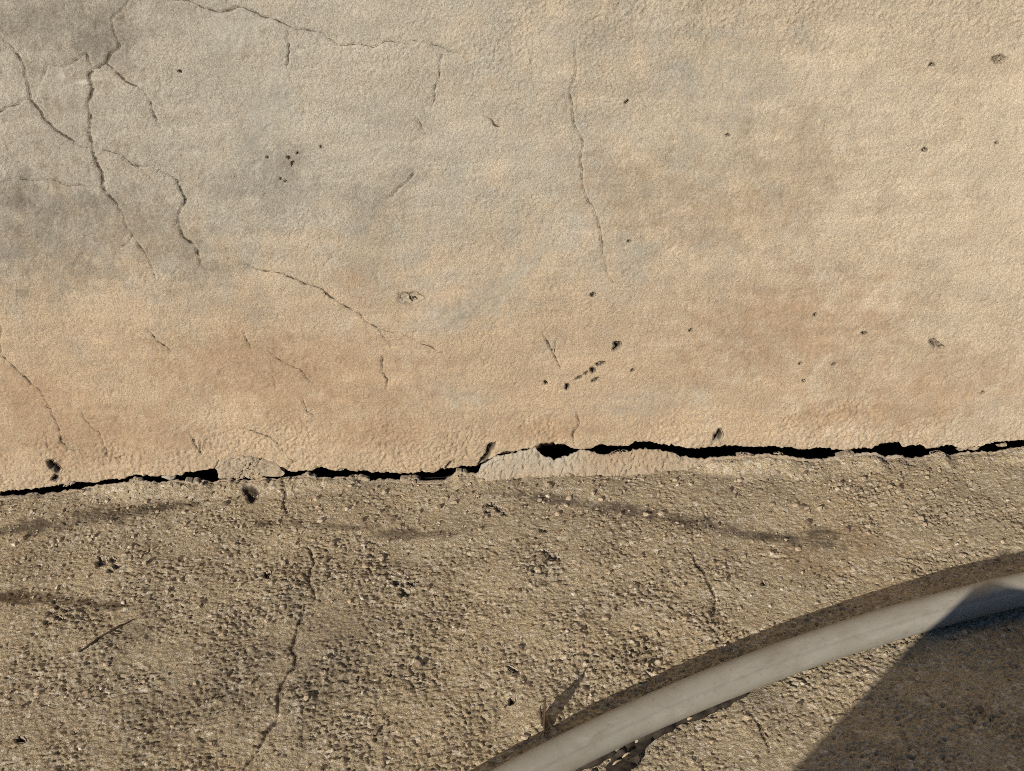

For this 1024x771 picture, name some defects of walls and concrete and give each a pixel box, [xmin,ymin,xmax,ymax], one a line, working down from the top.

crack [0,10,157,280]
crack [168,174,201,262]
crack [183,0,454,131]
crack [244,264,435,383]
crack [0,332,1024,513]
crack [244,549,315,771]